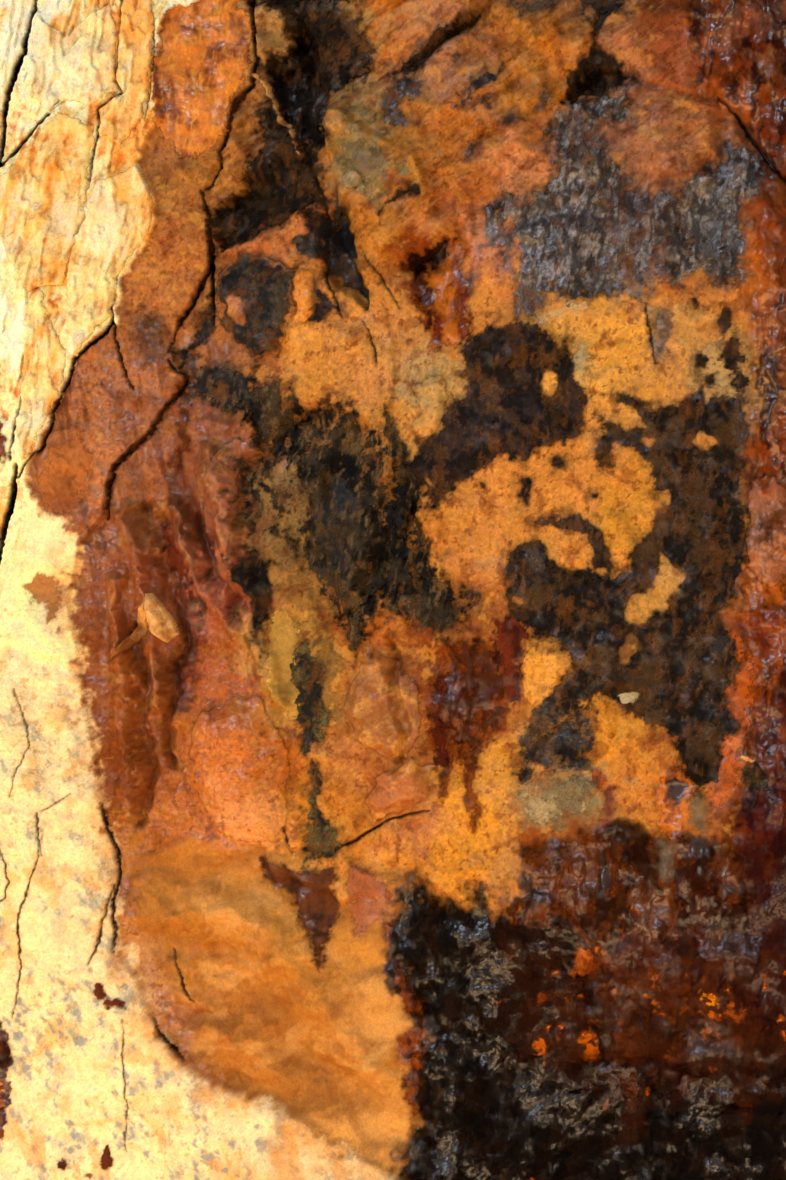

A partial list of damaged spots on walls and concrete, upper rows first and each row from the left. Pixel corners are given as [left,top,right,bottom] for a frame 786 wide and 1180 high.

crack [0,0,50,167]
crack [90,26,155,181]
corrosion [762,0,786,76]
crack [106,0,261,517]
damp [129,0,774,825]
crack [88,804,122,964]
crack [154,1018,185,1061]
crack [175,950,194,1002]